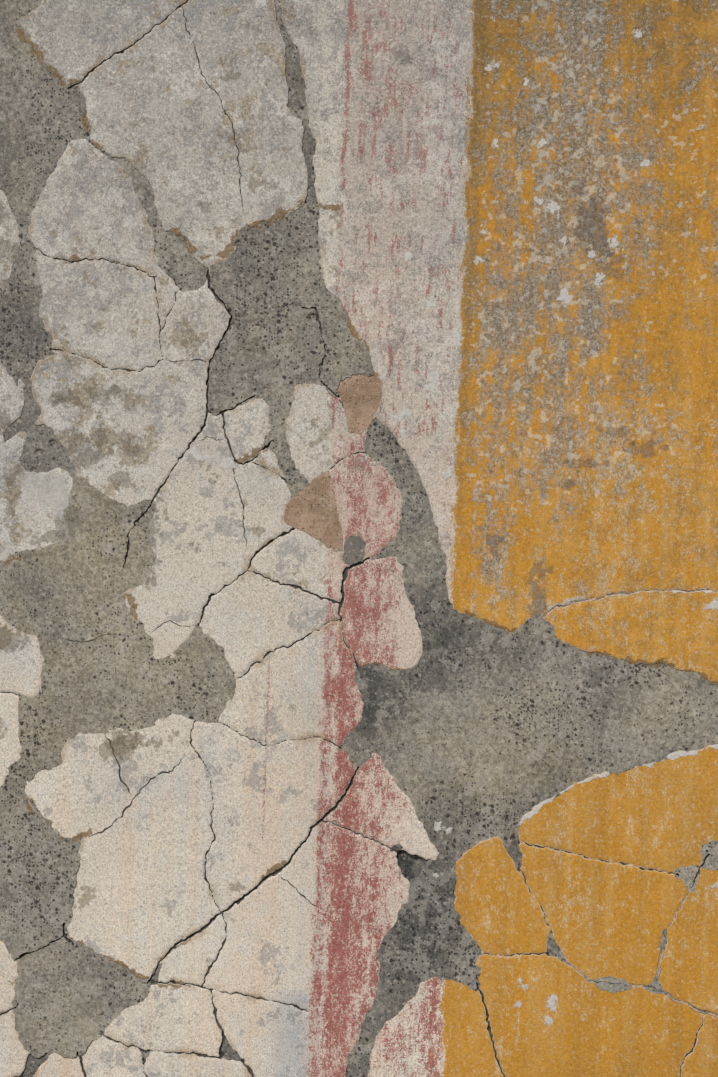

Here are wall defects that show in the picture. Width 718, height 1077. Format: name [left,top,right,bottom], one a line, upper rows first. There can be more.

crack [69,0,243,208]
crack [17,923,74,959]
spalling [0,0,374,1077]
crack [34,247,369,678]
crack [90,720,394,1077]
spalling [338,418,718,1077]
crack [477,842,718,1077]
crack [545,589,716,616]